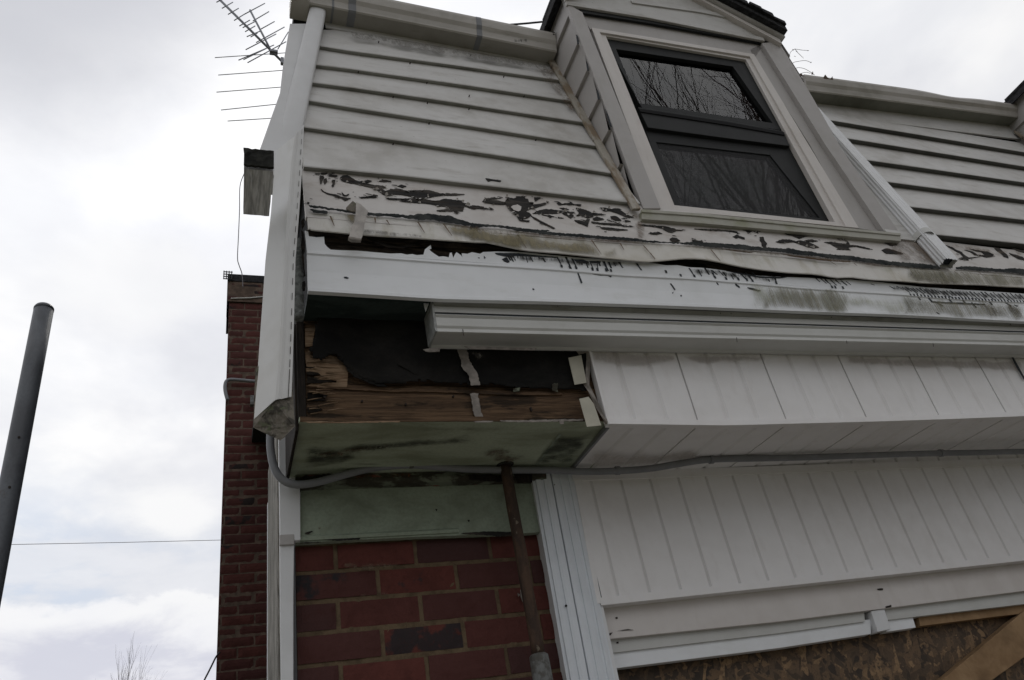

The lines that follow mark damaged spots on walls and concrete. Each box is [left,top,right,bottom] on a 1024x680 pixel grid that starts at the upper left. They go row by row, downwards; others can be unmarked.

peeling [313,173,903,262]
water stain [680,268,851,310]
water stain [890,242,1024,318]
peeling [946,244,1024,260]